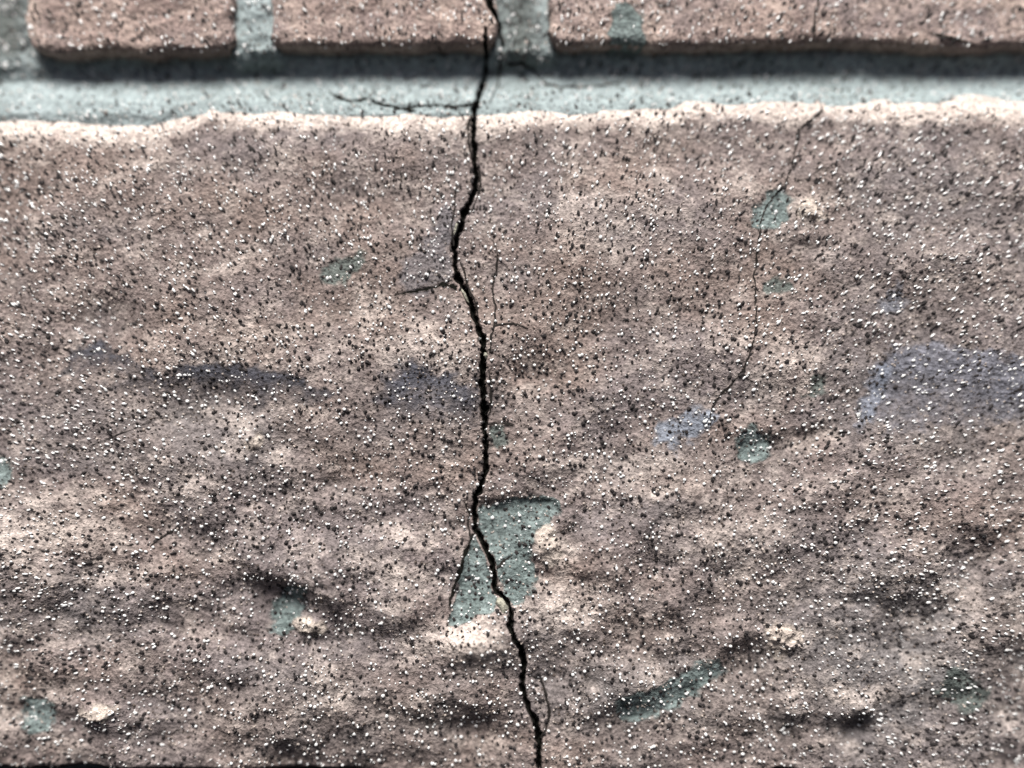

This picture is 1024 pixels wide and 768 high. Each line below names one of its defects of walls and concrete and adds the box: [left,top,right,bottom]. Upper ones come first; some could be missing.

peeling [751,190,791,229]
crack [328,0,624,768]
peeling [736,423,769,463]
spalling [449,495,561,626]
peeling [616,659,725,722]